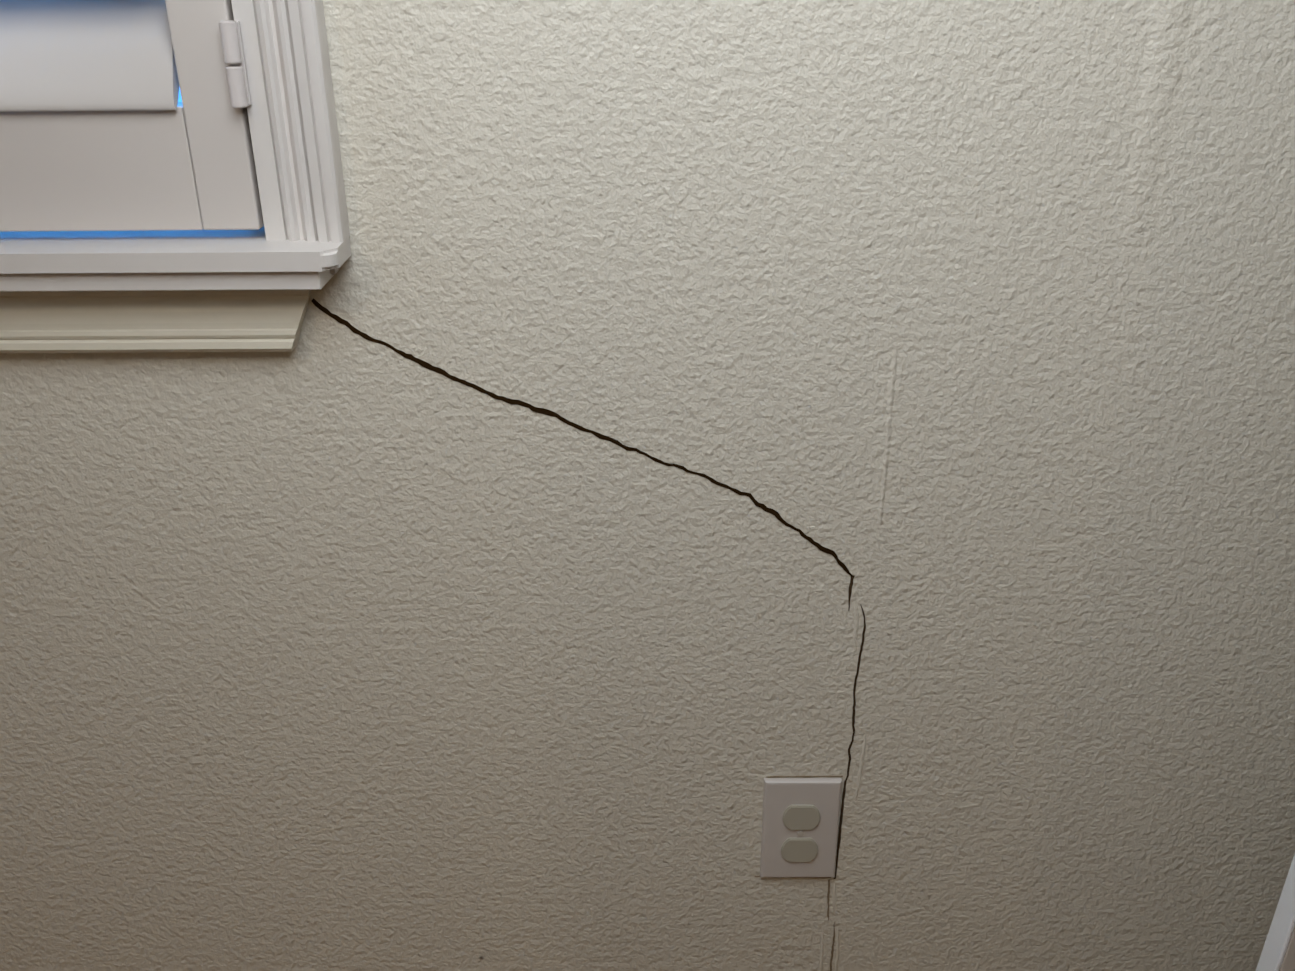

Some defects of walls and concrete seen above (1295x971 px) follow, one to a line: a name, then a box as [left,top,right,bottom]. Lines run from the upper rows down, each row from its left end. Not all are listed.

crack [312,298,866,971]